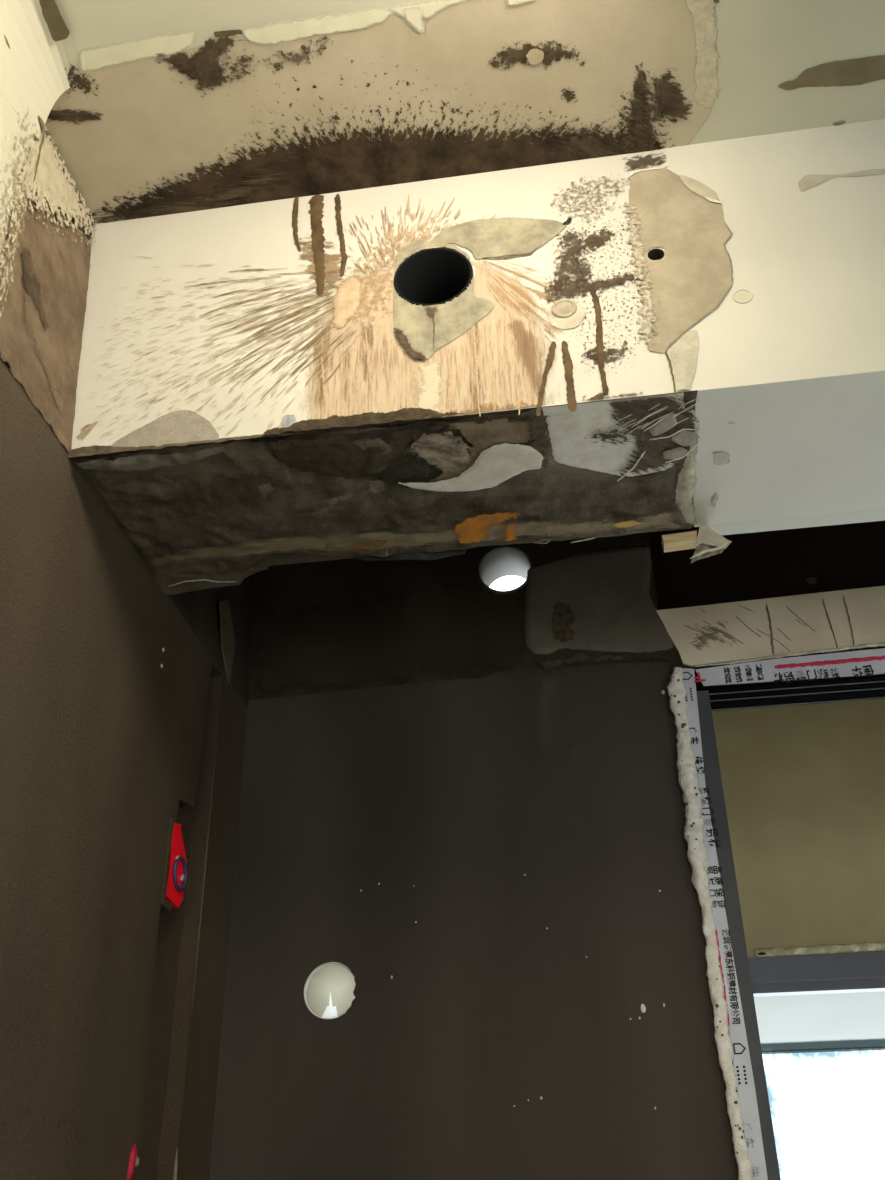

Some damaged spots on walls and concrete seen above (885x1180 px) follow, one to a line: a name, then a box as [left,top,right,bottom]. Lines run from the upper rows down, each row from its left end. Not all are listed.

peeling [0,0,733,595]
damp [77,36,674,446]
peeling [778,55,885,90]
rust [454,512,520,544]